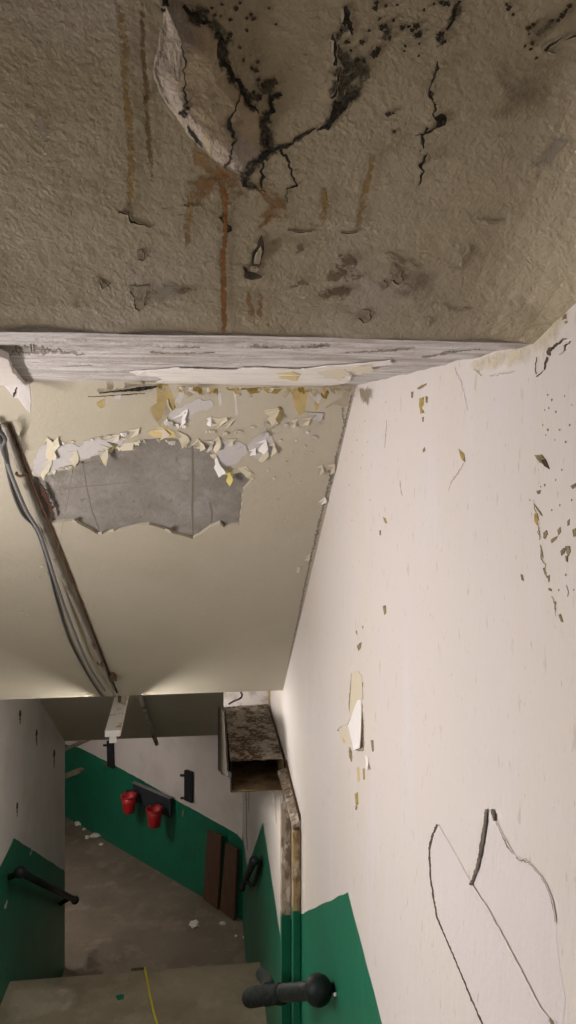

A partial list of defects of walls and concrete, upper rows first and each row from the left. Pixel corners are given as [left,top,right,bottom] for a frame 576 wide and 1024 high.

rust [117,3,154,205]
crack [181,4,362,203]
water stain [336,0,422,100]
crack [415,61,439,185]
crack [446,1,462,30]
rust [184,150,243,332]
spalling [243,235,264,280]
crack [250,338,572,410]
spalling [32,360,393,559]
peeling [529,455,576,622]
peeling [337,671,374,810]